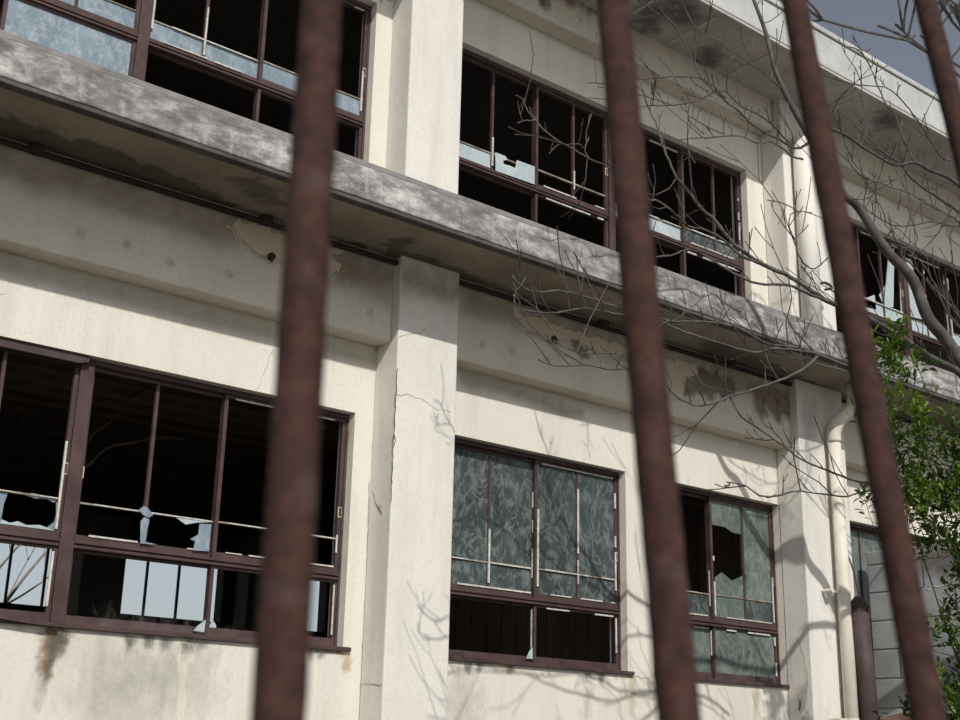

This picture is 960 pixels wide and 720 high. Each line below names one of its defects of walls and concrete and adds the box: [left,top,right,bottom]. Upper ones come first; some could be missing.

leakage [0,116,235,208]
peeling [224,218,285,266]
peeling [329,246,345,284]
peeling [512,304,626,357]
leakage [685,369,735,399]
leakage [704,343,813,384]
leakage [754,389,790,420]
crack [358,369,450,720]